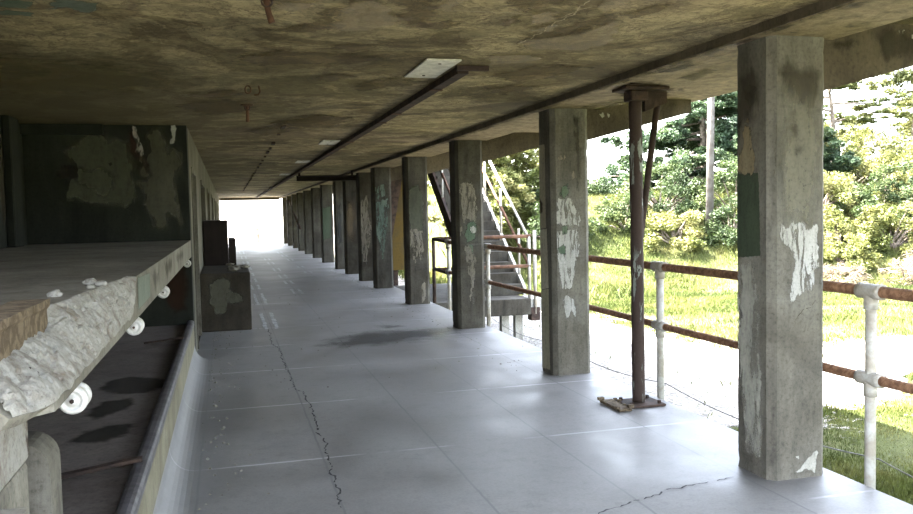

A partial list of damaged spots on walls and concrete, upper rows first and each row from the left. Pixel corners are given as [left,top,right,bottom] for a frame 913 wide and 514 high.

damp [268,2,353,33]
damp [240,44,428,91]
damp [388,0,461,30]
damp [554,4,670,36]
damp [737,70,757,137]
spalling [0,273,150,417]
peeling [62,127,183,230]
peeling [208,278,244,314]
peeling [459,181,478,303]
peeling [556,171,581,319]
peeling [780,83,822,302]
crack [268,329,342,507]